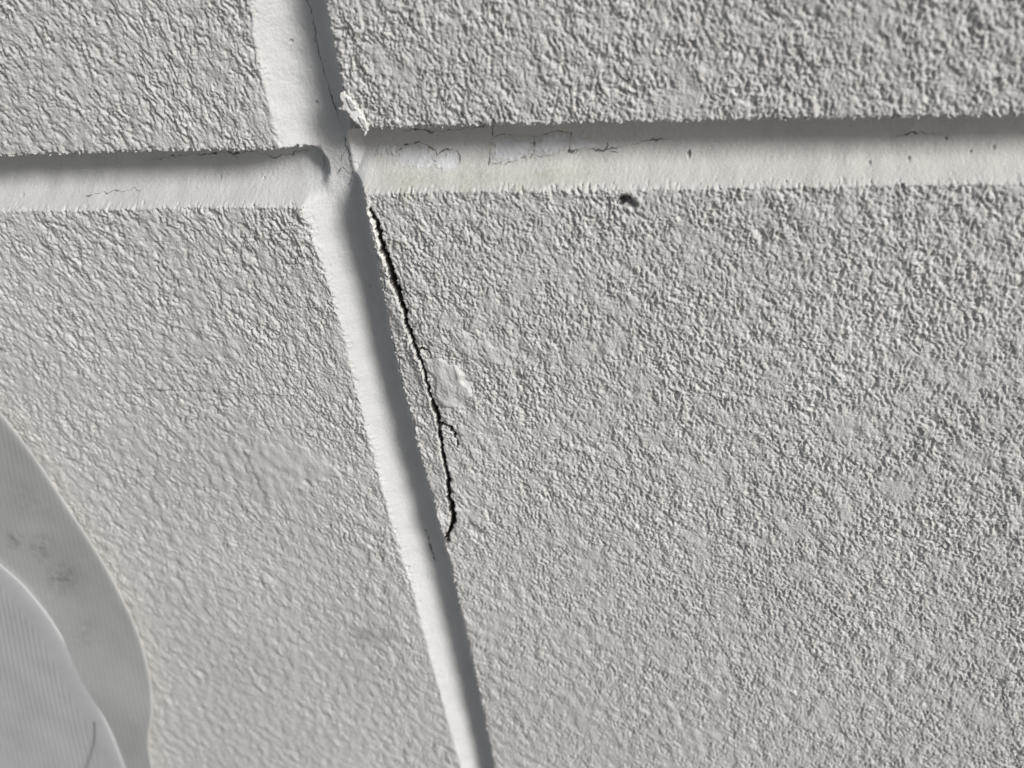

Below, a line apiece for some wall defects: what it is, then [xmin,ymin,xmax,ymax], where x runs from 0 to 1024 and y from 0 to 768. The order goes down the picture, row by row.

peeling [339,91,369,136]
crack [369,208,459,562]